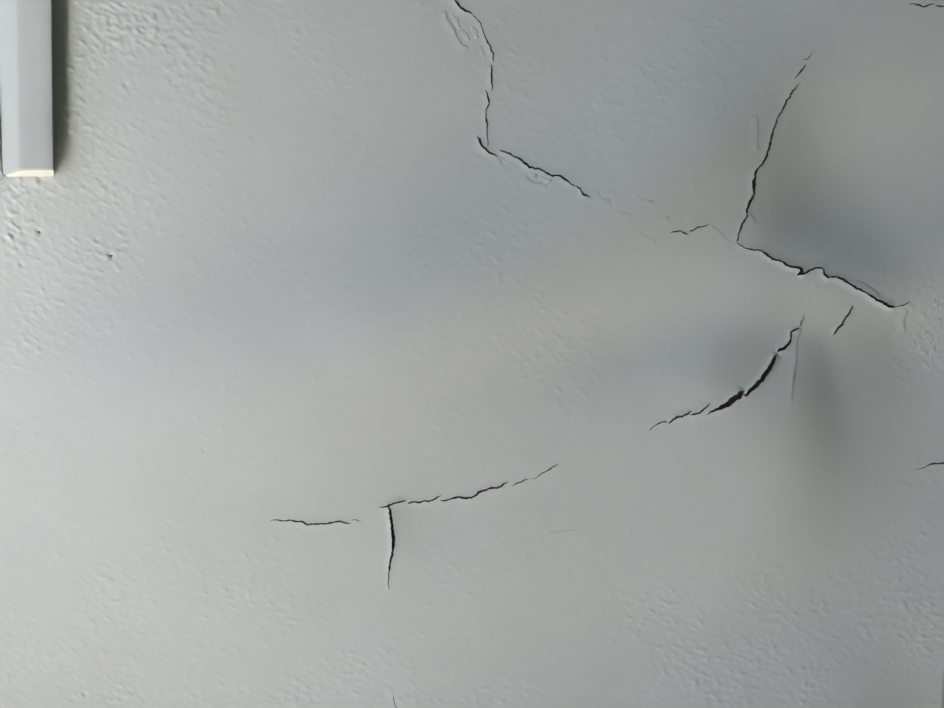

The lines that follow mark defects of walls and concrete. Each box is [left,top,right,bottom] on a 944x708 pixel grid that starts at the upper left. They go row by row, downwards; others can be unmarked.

crack [420,0,912,338]
crack [647,314,807,432]
crack [269,461,561,590]
crack [915,458,944,472]